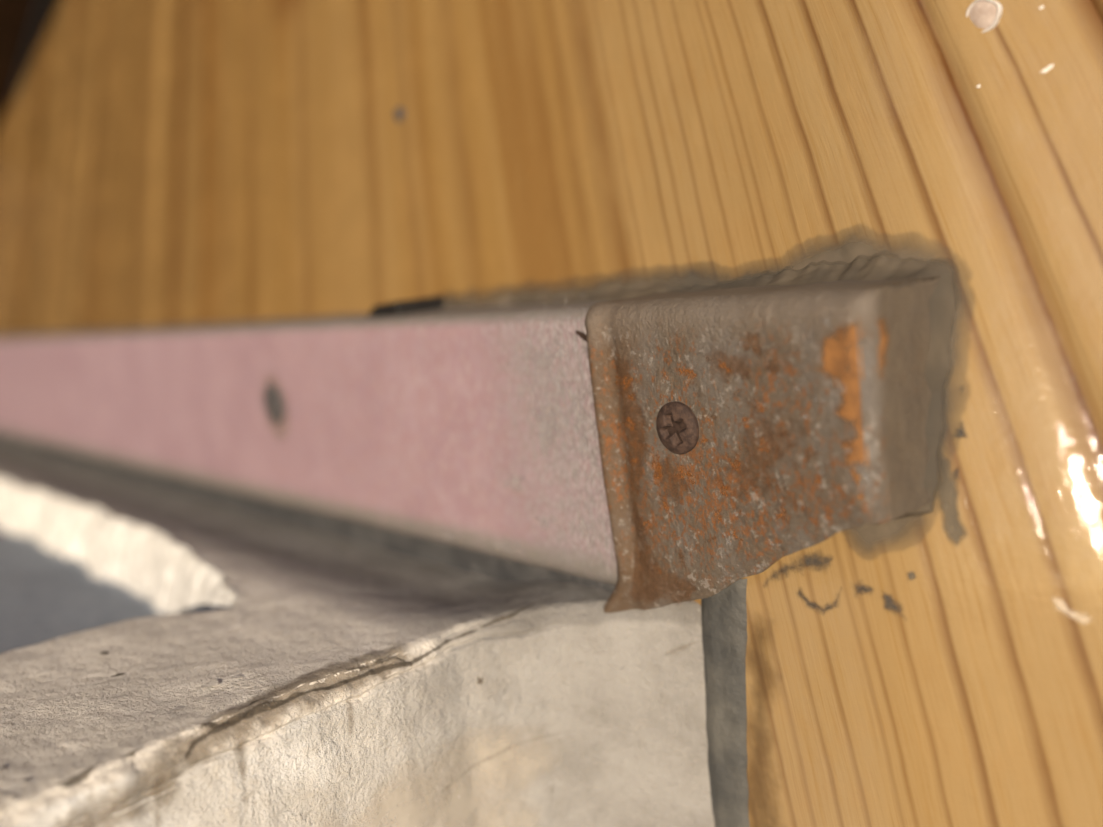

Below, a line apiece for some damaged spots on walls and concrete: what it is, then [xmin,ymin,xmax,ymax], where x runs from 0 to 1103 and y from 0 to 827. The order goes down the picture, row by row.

rust [616,363,695,510]
rust [822,323,869,499]
spalling [0,478,239,654]
crack [57,765,96,787]